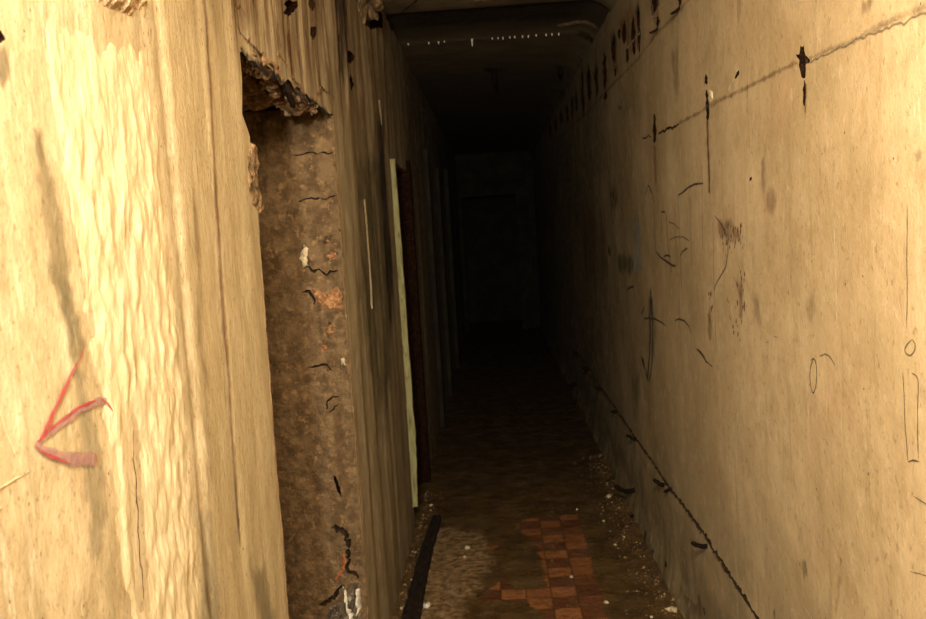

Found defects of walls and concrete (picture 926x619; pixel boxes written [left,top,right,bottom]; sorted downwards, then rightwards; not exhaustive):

spalling [97,0,148,16]
spalling [366,11,383,30]
spalling [240,48,328,115]
crack [642,123,679,139]
crack [294,149,333,157]
crack [298,194,337,202]
crack [302,266,338,305]
crack [309,363,332,371]
crack [325,396,339,412]
crack [577,354,759,619]
crack [319,524,359,606]